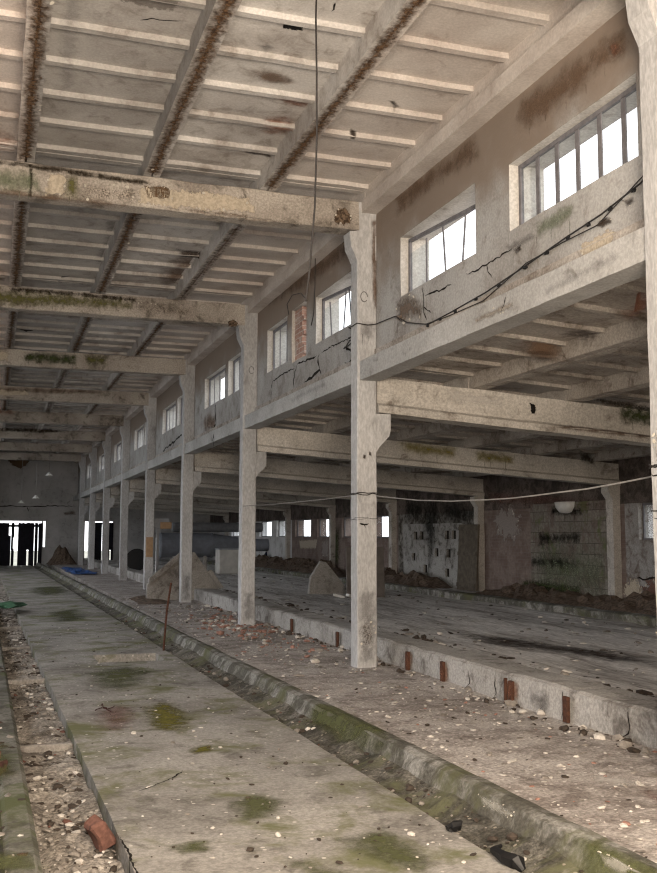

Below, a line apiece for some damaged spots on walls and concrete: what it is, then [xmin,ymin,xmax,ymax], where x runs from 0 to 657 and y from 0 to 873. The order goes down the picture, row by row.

leakage [522,35,623,122]
leakage [0,0,242,301]
crack [271,337,351,388]
peeling [623,576,656,599]
crack [120,837,139,873]